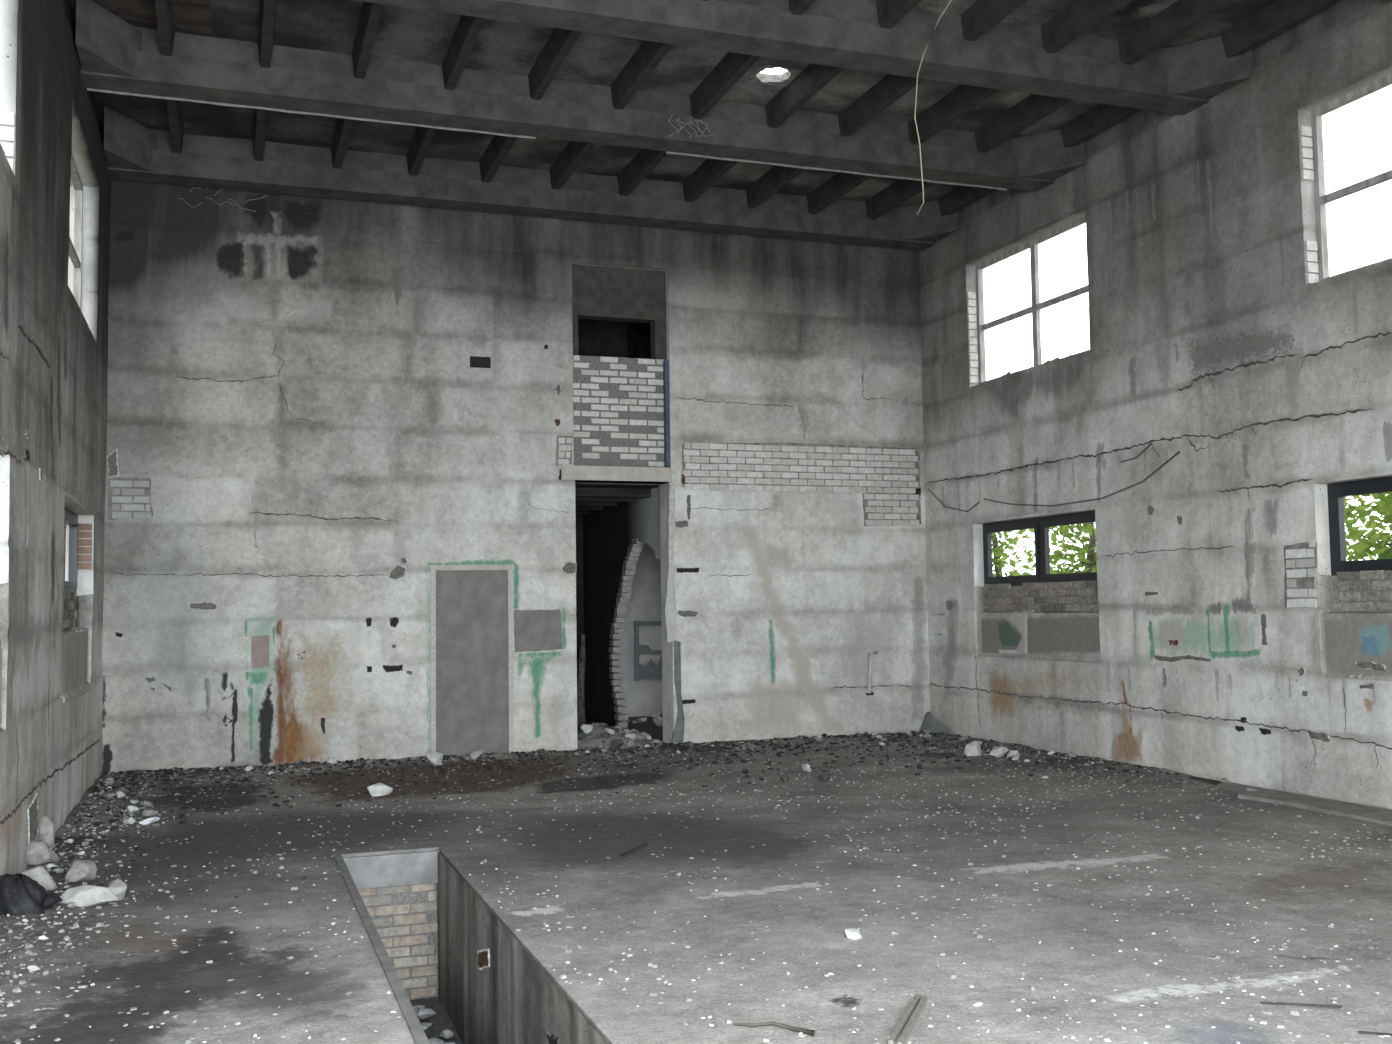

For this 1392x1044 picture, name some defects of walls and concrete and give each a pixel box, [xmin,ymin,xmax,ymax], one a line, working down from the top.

crack [0,325,51,368]
crack [1178,332,1392,391]
crack [929,409,1370,483]
crack [1218,479,1310,500]
rust [267,602,585,804]
crack [827,656,1392,766]
rust [1111,671,1150,767]
crack [0,729,100,824]